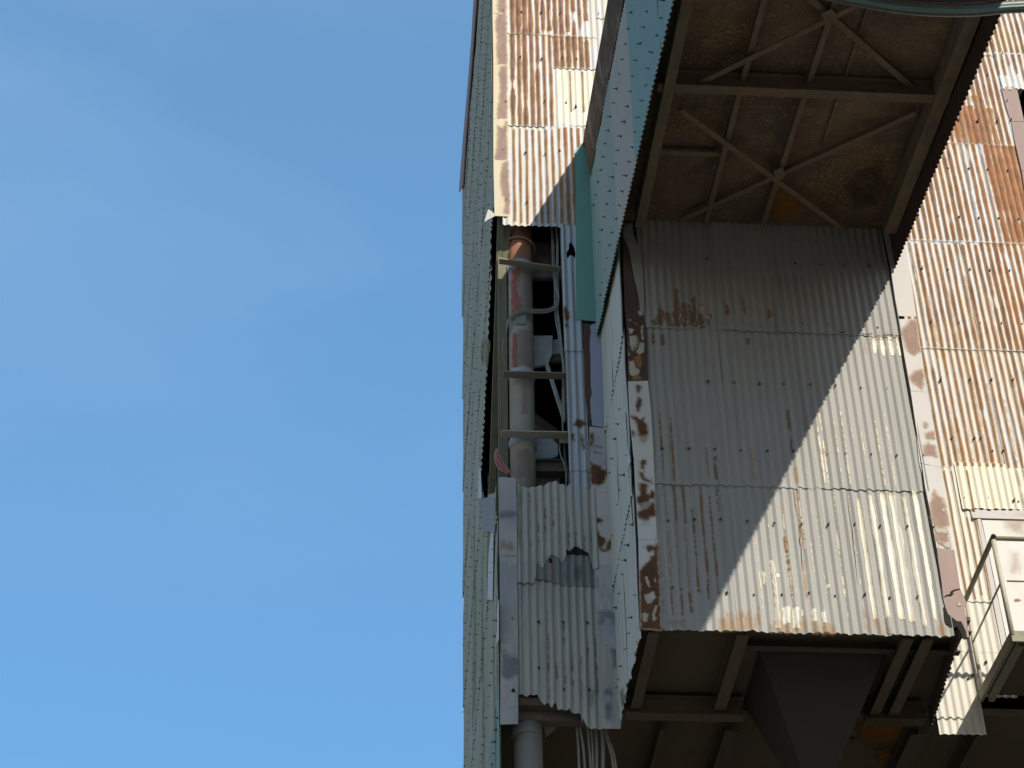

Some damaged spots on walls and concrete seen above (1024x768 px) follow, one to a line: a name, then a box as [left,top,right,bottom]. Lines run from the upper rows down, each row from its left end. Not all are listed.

corrosion [495,0,590,262]
peeling [627,311,648,435]
corrosion [652,289,712,345]
peeling [872,320,921,356]
peeling [911,369,924,388]
corrosion [904,0,1024,599]
corrosion [590,462,606,485]
peeling [797,411,952,627]
peeling [755,541,827,629]